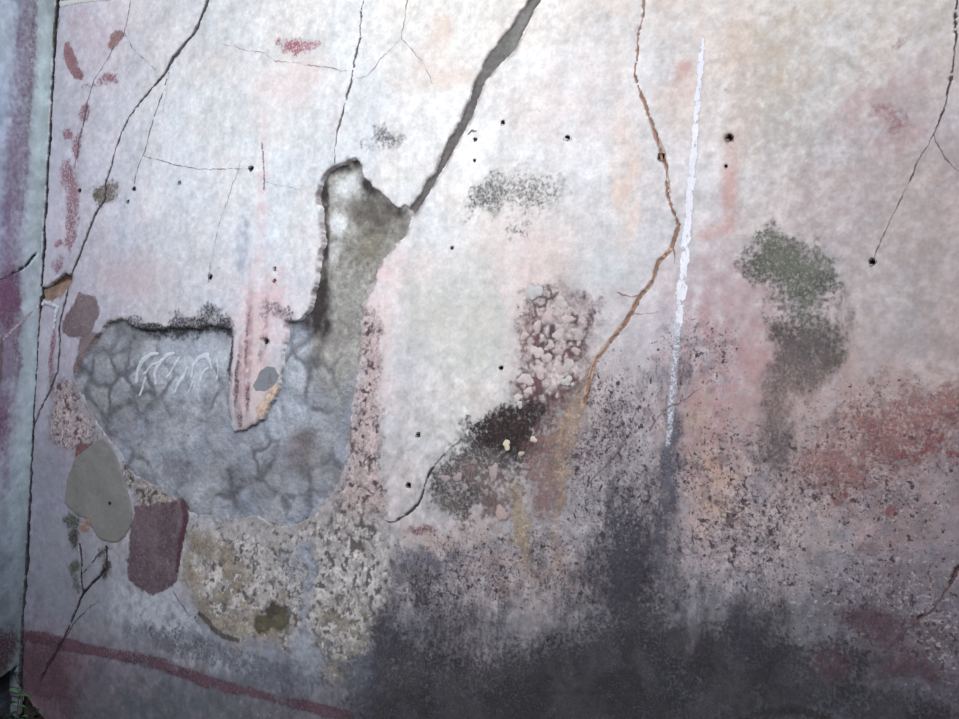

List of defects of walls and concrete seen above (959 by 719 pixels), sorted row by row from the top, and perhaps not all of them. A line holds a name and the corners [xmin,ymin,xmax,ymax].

crack [308,1,384,163]
crack [898,0,958,205]
crack [583,0,680,404]
crack [0,0,239,688]
damp [128,304,234,396]
flaking render [74,160,415,530]
damp [338,37,959,719]
flaking render [63,512,90,547]
damp [135,542,335,702]
flaking render [182,532,291,642]
crack [387,442,458,523]
crack [881,567,959,653]